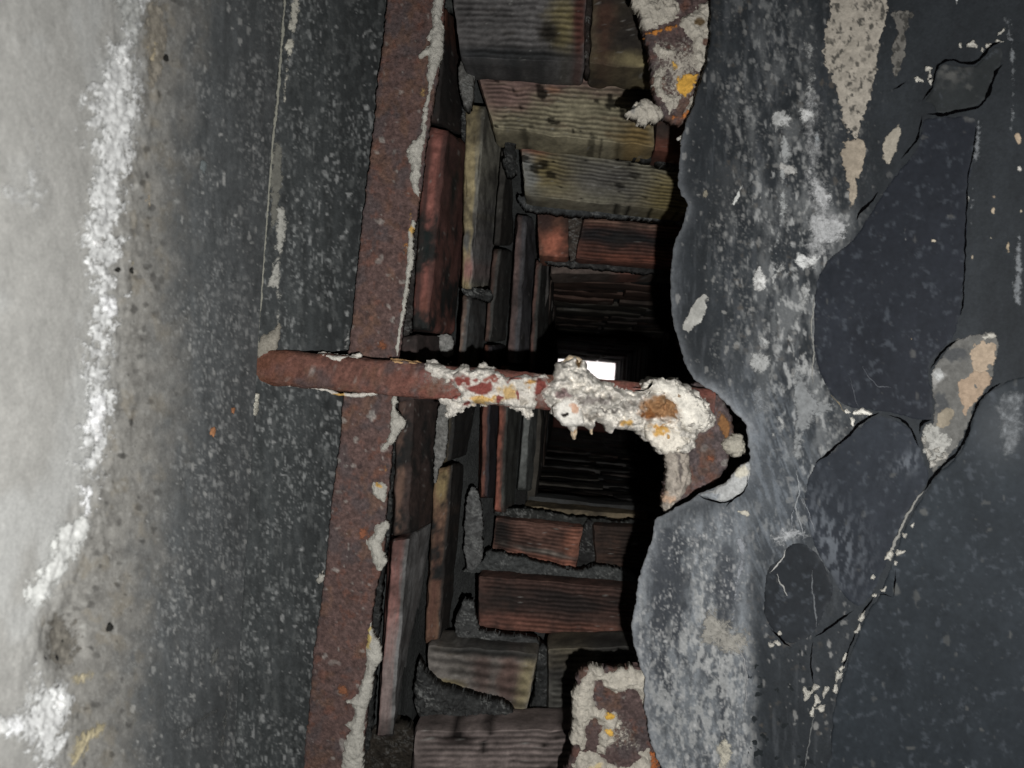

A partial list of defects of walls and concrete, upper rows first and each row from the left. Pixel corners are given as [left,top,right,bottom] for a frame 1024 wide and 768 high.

corrosion [672,61,698,97]
peeling [822,0,914,205]
crack [893,40,1002,312]
water stain [23,0,168,608]
peeling [682,294,709,333]
corrosion [718,412,730,438]
spalling [701,462,751,502]
crack [816,413,931,463]
peeling [748,47,1024,768]
crack [924,383,1001,491]
crack [773,572,896,684]
water stain [0,662,105,768]